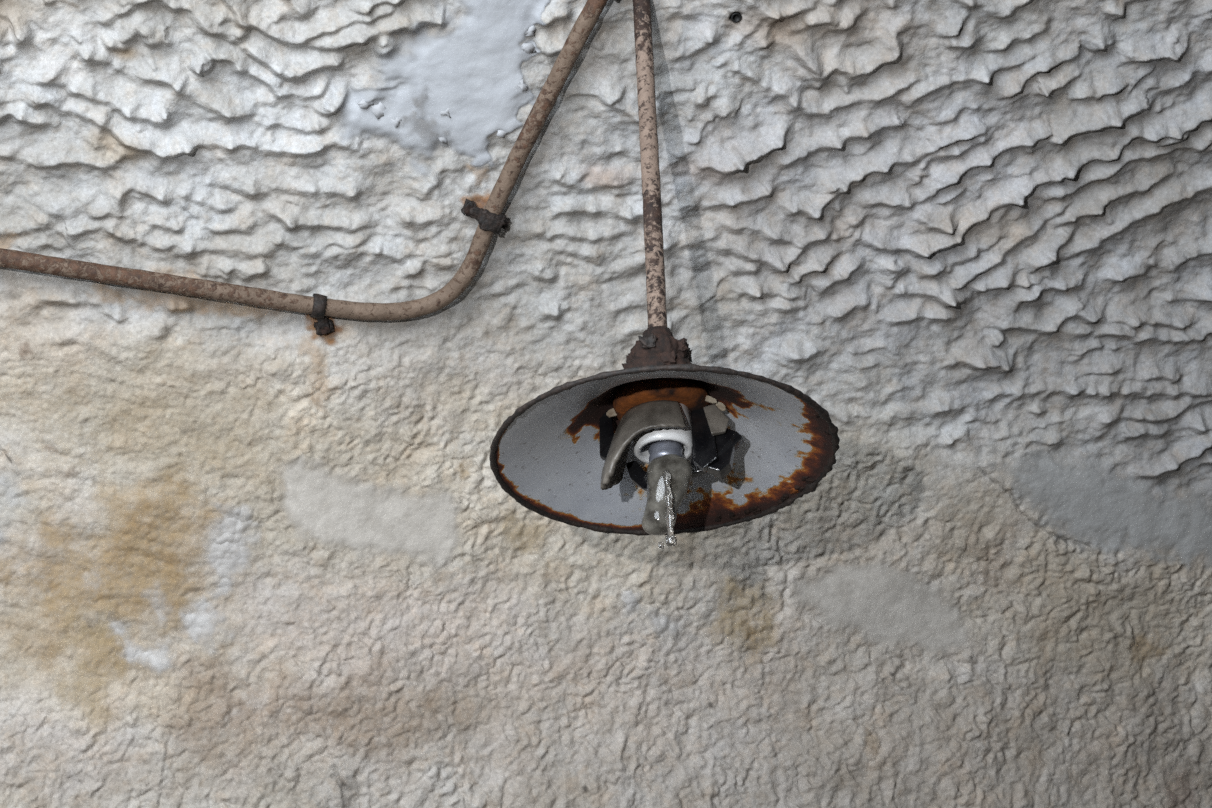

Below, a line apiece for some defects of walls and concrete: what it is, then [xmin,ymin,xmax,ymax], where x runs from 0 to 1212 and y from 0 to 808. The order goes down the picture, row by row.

peeling [341,0,550,172]
damp [210,508,247,593]
damp [107,623,169,670]
damp [183,600,216,641]